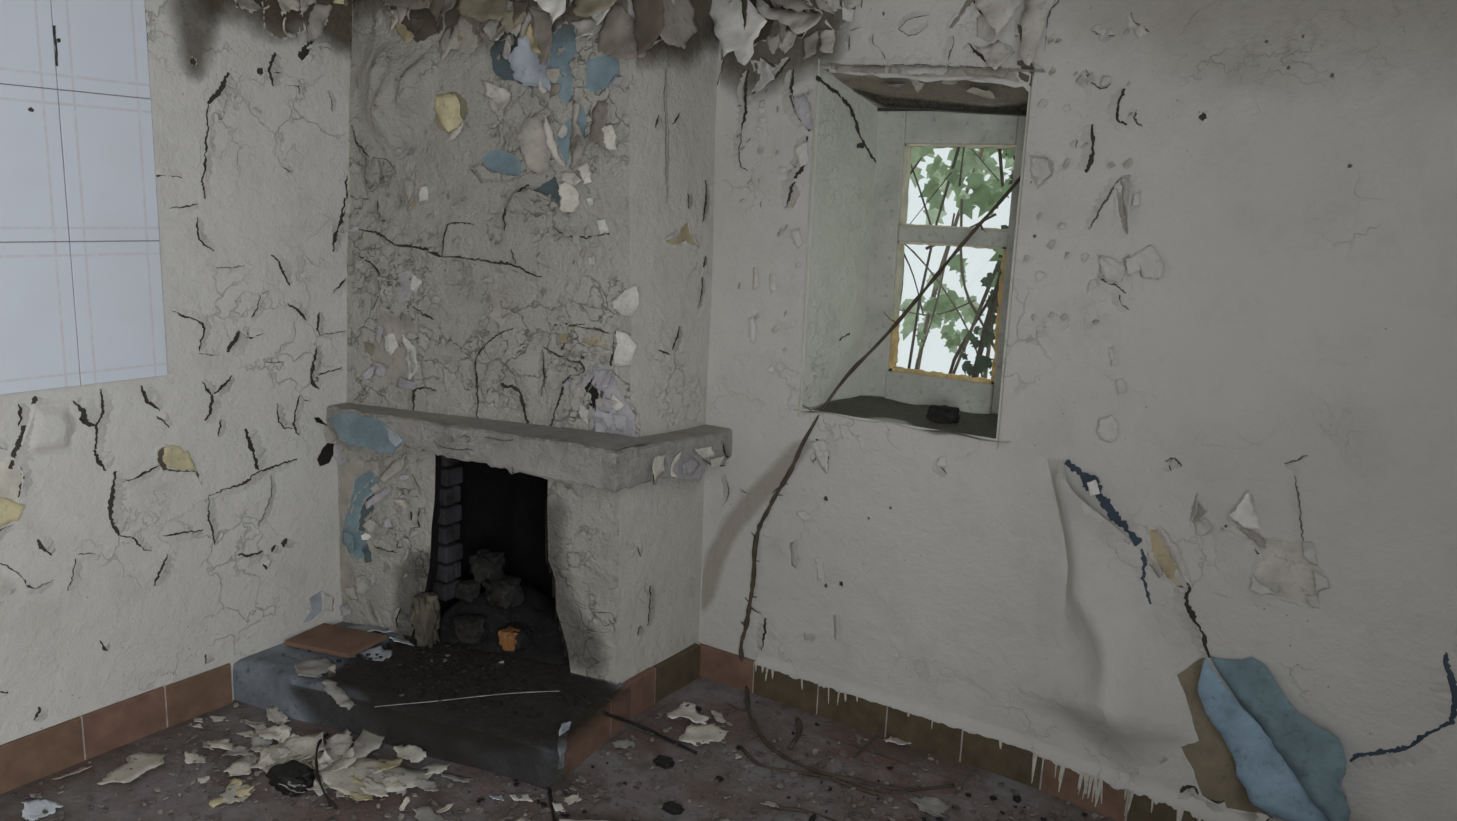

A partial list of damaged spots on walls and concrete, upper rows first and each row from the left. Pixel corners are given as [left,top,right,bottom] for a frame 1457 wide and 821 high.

spalling [253,64,267,79]
peeling [234,0,357,43]
peeling [374,0,1071,265]
crack [553,221,610,239]
crack [0,15,542,606]
peeling [0,454,25,527]
peeling [301,409,427,646]
crack [374,322,616,559]
crack [1065,457,1211,658]
crack [100,638,112,651]
crack [0,691,49,722]
crack [1349,649,1457,770]